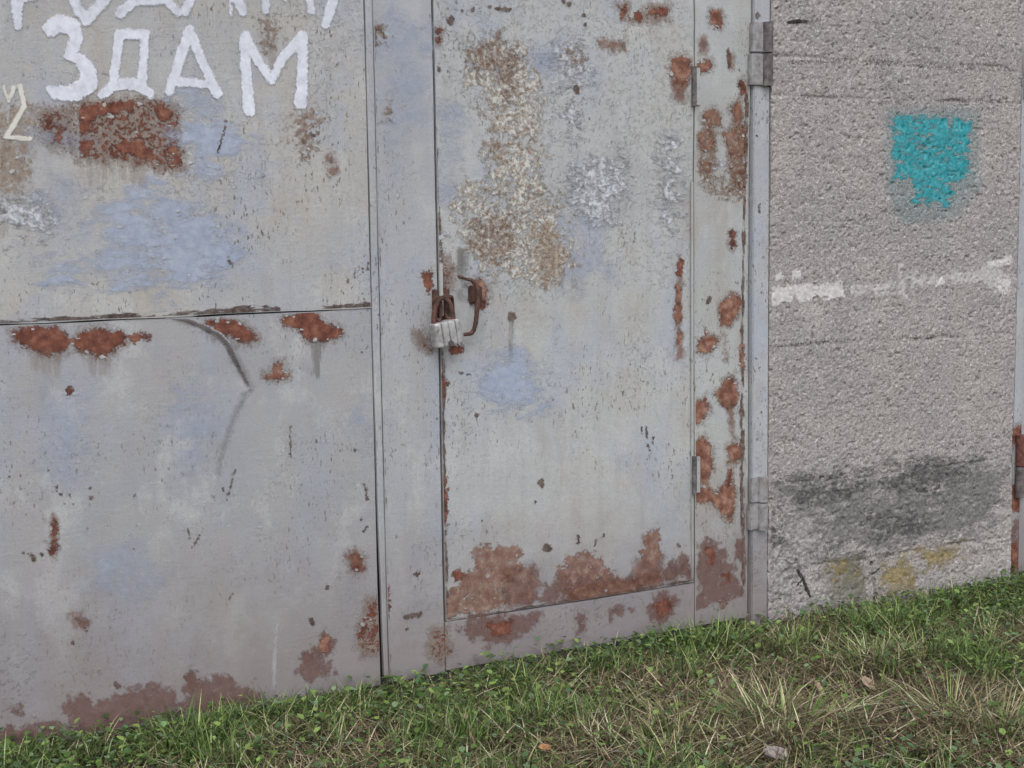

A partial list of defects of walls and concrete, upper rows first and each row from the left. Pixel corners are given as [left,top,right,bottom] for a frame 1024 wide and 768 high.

rust [412,80,749,649]